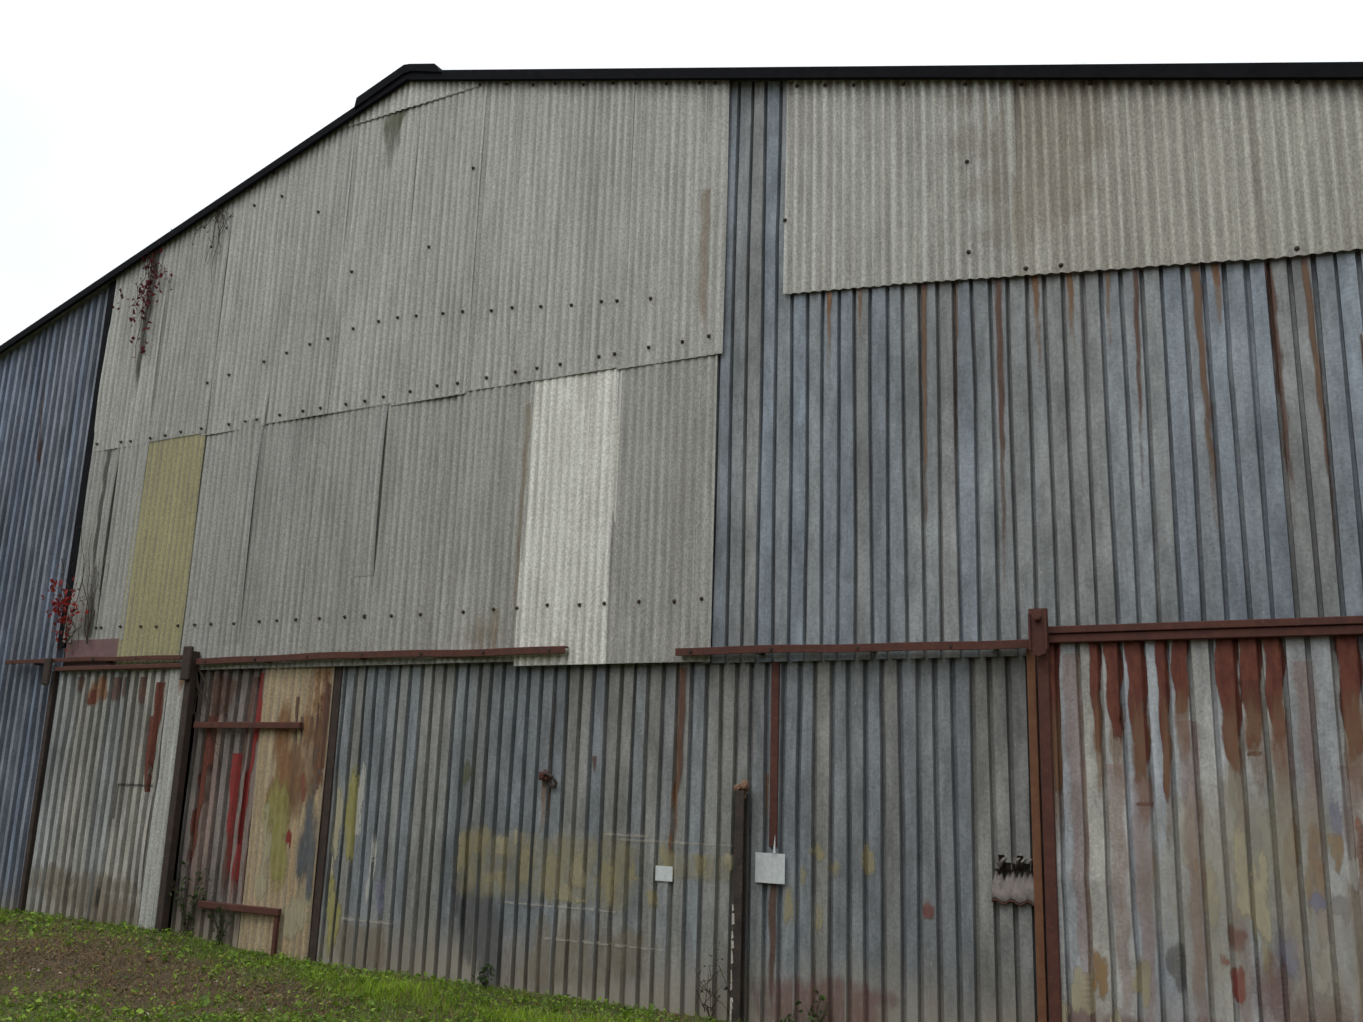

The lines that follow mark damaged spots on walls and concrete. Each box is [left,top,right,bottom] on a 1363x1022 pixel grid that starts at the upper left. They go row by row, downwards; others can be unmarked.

rust [995,277,1005,512]
rust [1132,268,1141,413]
rust [1190,263,1220,478]
rust [1265,260,1290,470]
rust [1301,257,1331,478]
rust [77,676,184,792]
rust [186,676,236,863]
rust [267,667,332,806]
rust [1049,643,1063,793]
rust [1088,640,1190,806]
rust [1214,637,1287,776]
rust [1334,635,1363,764]